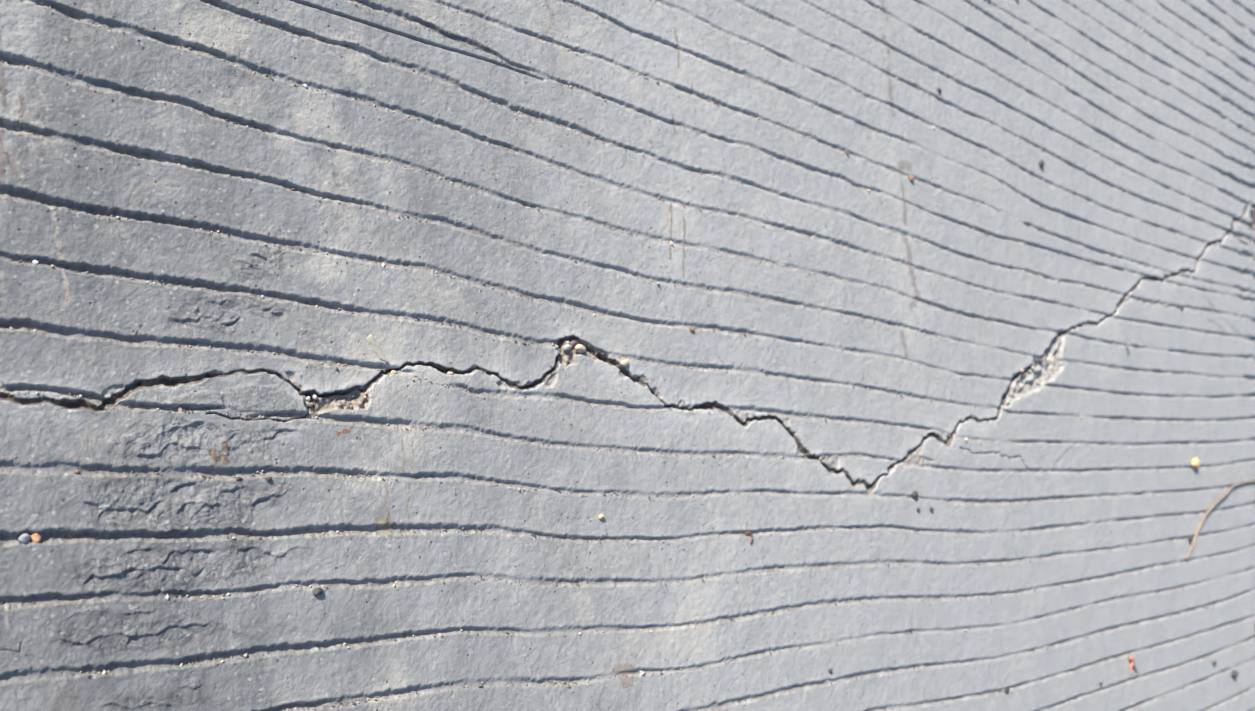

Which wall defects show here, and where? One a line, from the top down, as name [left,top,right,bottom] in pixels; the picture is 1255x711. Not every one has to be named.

spalling [303,389,369,416]
crack [0,204,1255,492]
spalling [999,337,1061,408]